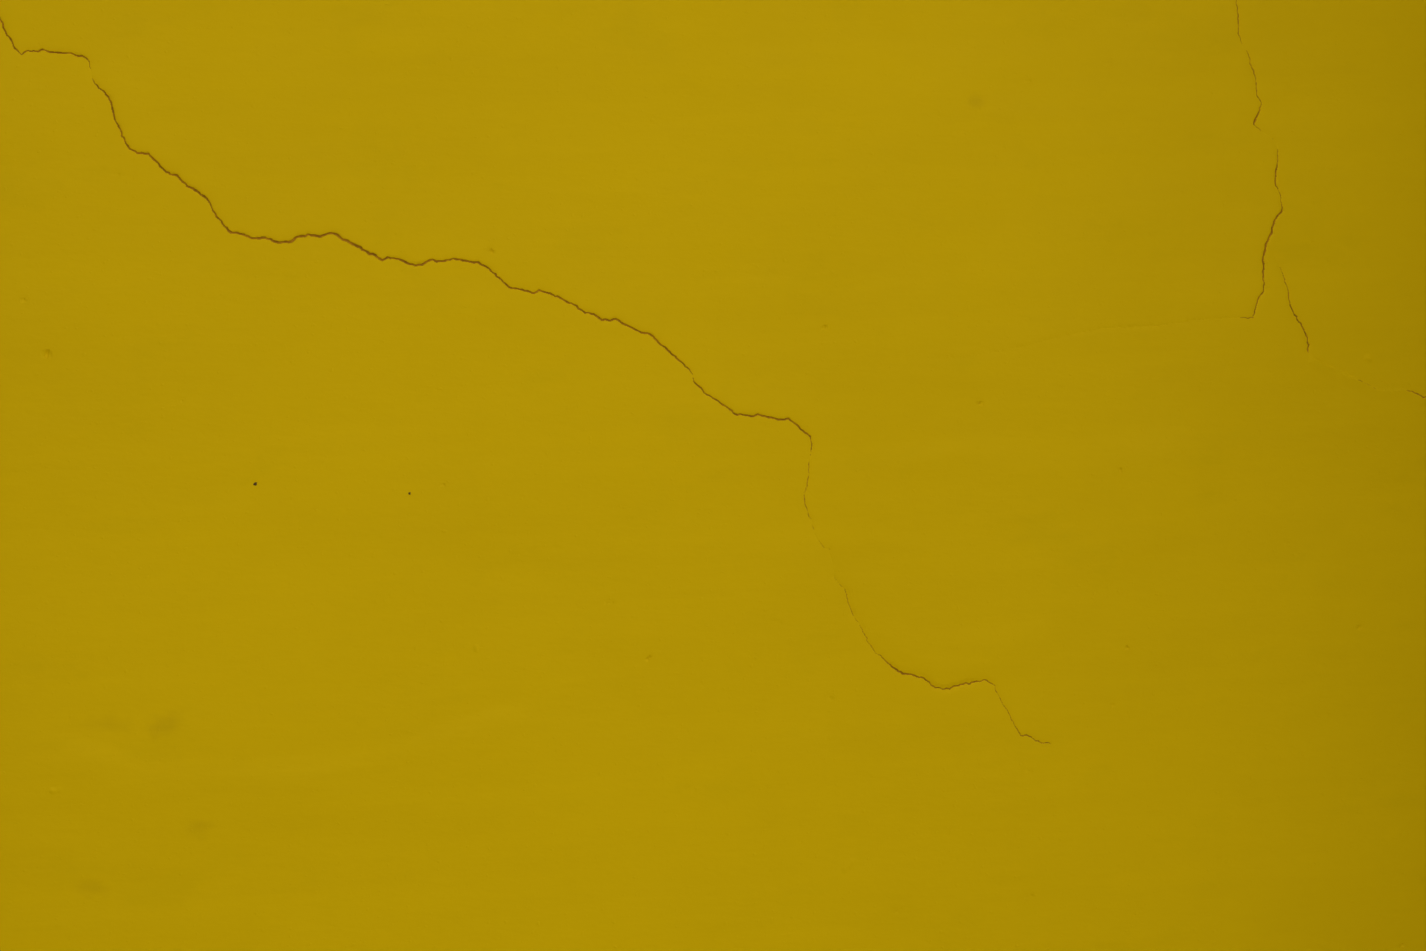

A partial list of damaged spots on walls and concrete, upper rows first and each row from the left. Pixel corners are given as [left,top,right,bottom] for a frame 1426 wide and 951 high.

crack [0,8,1059,750]